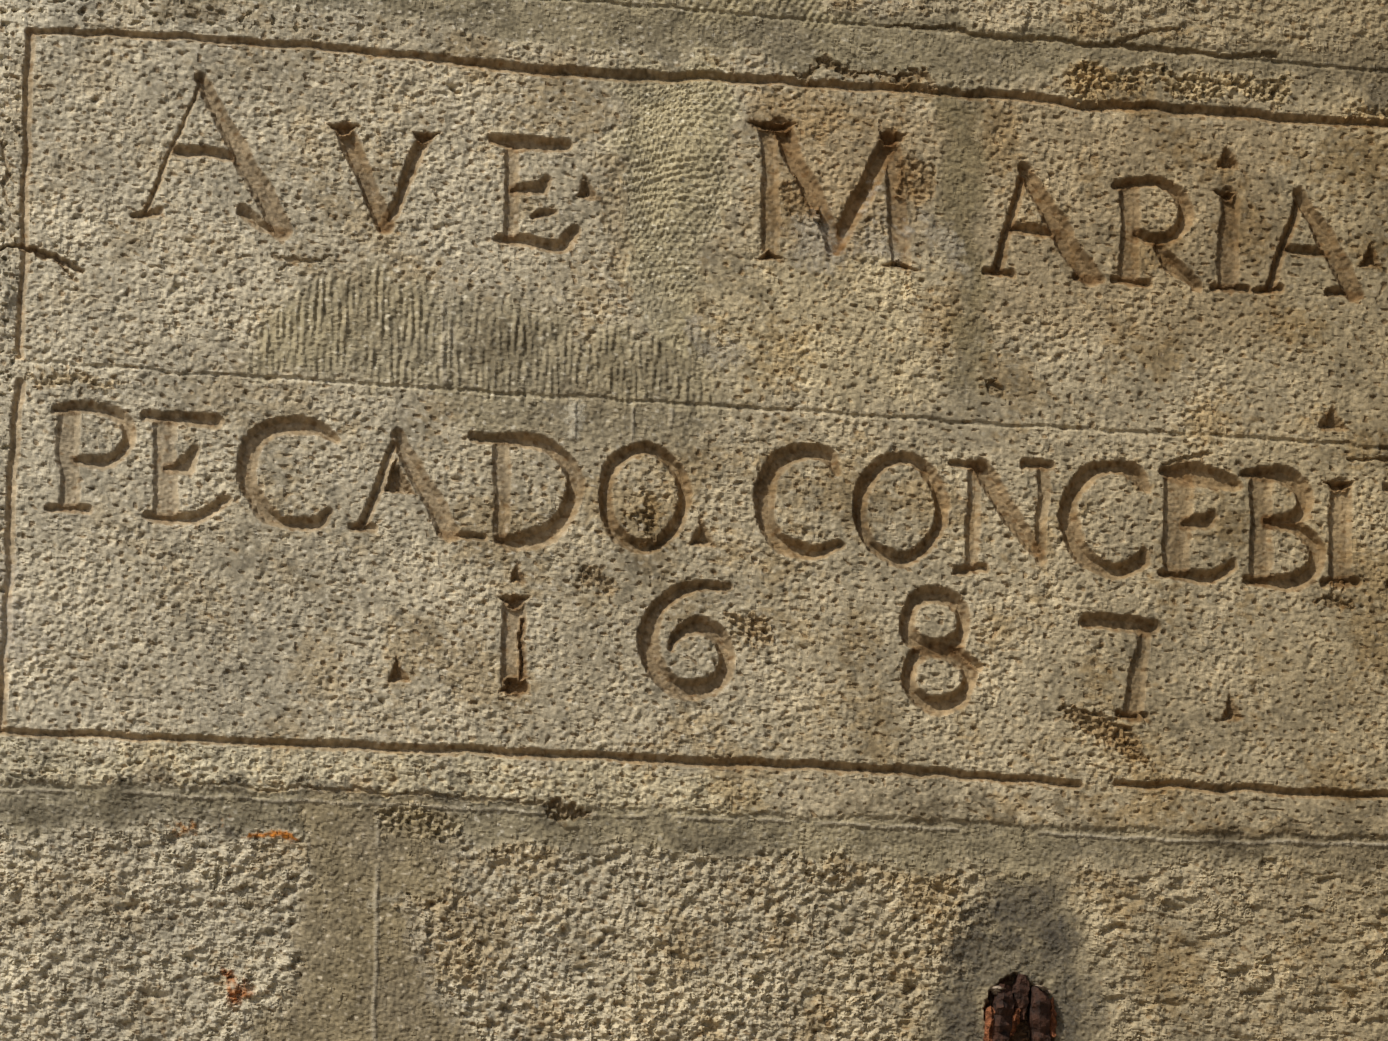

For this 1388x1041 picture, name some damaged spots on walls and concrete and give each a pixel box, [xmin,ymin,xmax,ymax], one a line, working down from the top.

crack [1,142,17,207]
crack [0,242,86,281]